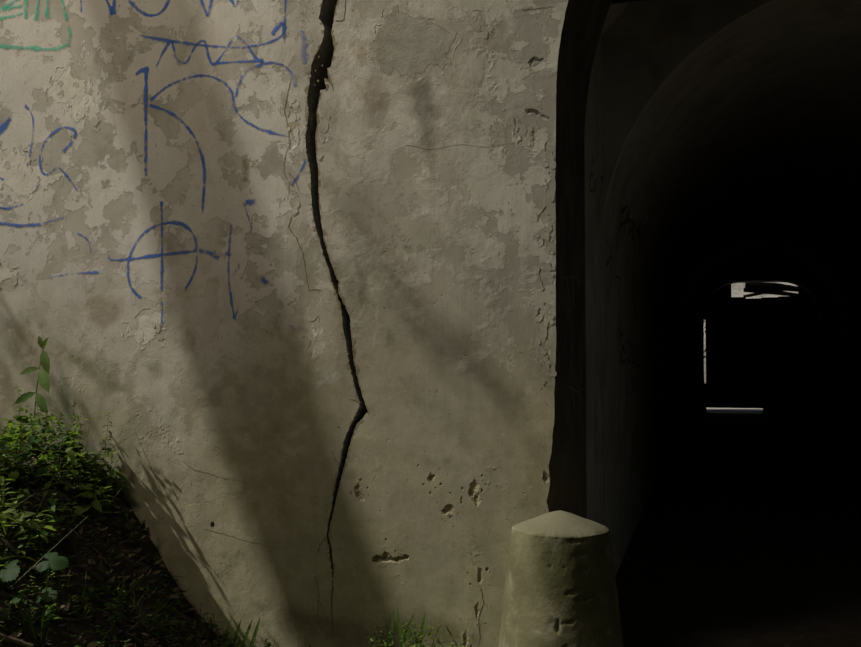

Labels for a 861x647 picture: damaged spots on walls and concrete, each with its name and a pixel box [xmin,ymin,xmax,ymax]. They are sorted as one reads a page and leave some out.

peeling [367,3,463,84]
spalling [528,47,544,68]
peeling [44,61,107,133]
peeling [0,143,67,204]
peeling [511,104,556,293]
peeling [117,306,169,351]
crack [284,0,371,638]
peeling [532,302,557,387]
spalling [422,472,489,528]
spalling [372,538,409,569]